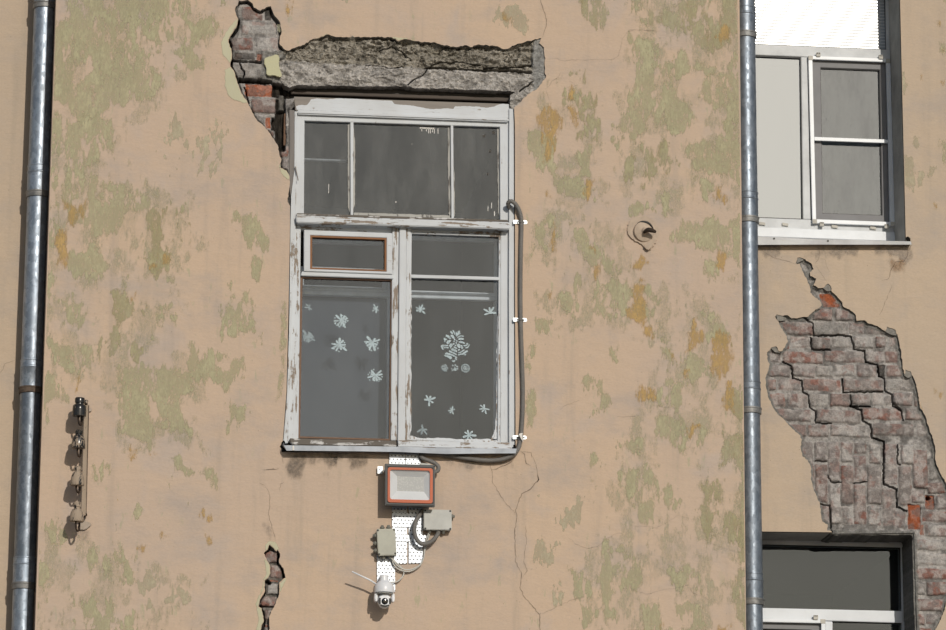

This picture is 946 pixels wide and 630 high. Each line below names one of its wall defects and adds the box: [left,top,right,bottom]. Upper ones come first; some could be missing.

peeling [493,4,529,36]
peeling [528,0,740,217]
peeling [531,209,746,630]
spalling [765,258,946,630]
spalling [256,541,286,630]